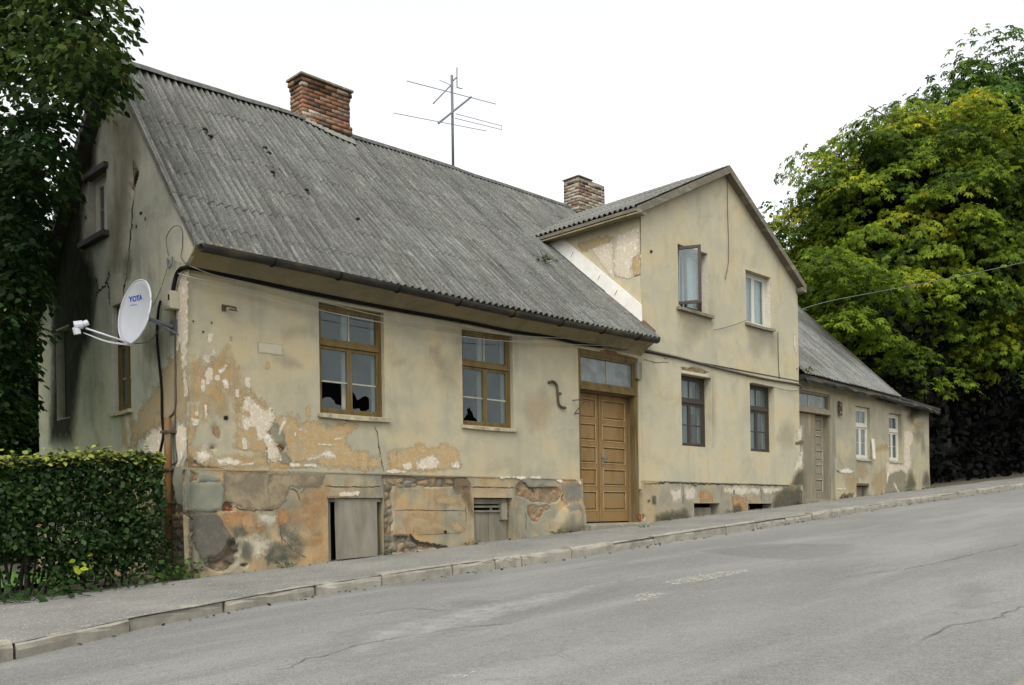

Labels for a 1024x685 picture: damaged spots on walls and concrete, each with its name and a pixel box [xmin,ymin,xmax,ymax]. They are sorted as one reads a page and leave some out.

crack [96,201,134,306]
peeling [591,226,653,281]
flaking render [129,266,341,579]
crack [234,428,384,557]
flaking render [382,455,469,554]
flaking render [500,476,563,522]
peeling [670,486,696,502]
peeling [724,486,783,497]
peeling [871,431,914,492]